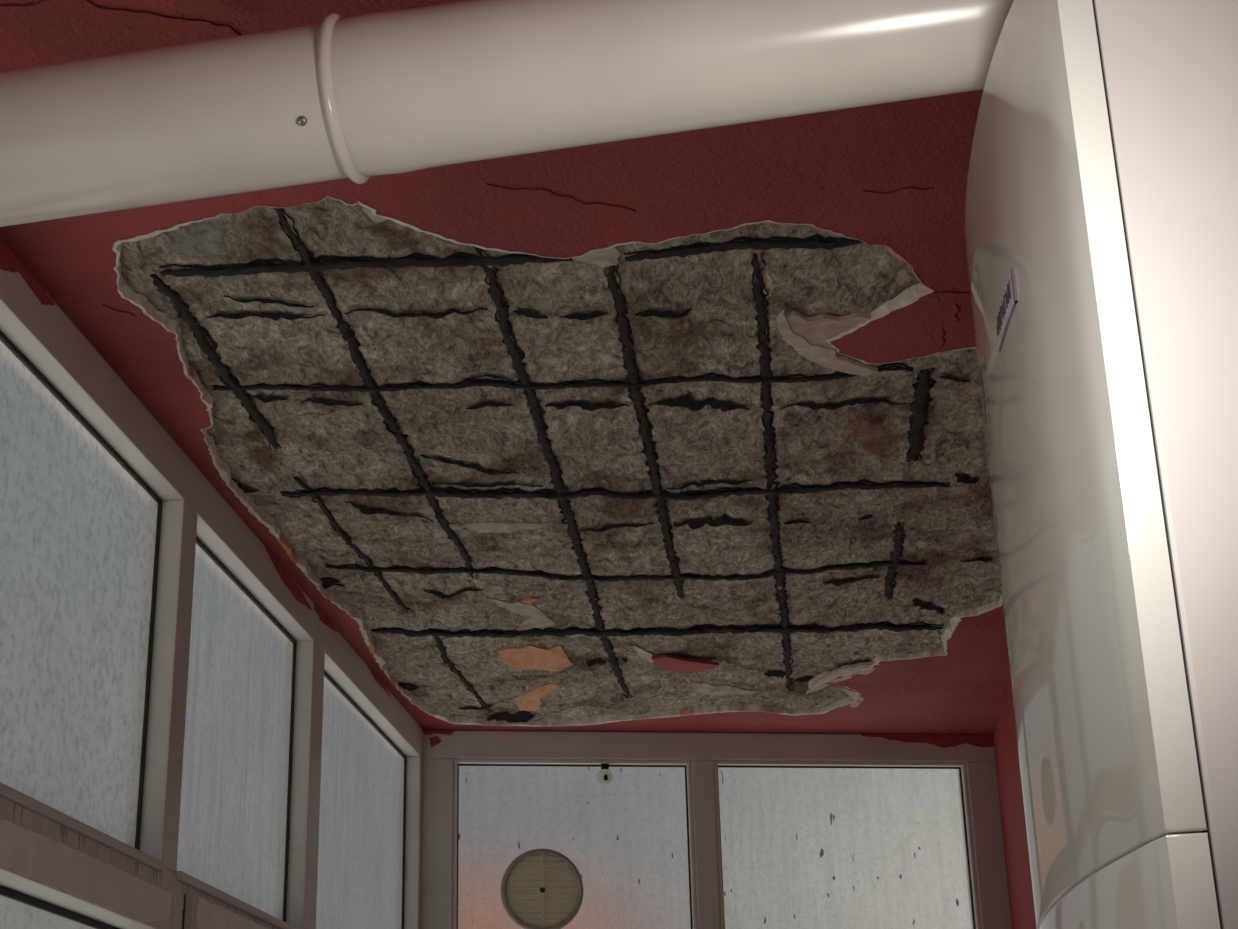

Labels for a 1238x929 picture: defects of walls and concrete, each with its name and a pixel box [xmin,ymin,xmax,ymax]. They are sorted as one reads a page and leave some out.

crack [0,0,47,8]
crack [86,0,241,35]
crack [486,183,636,212]
spalling [112,196,1003,748]